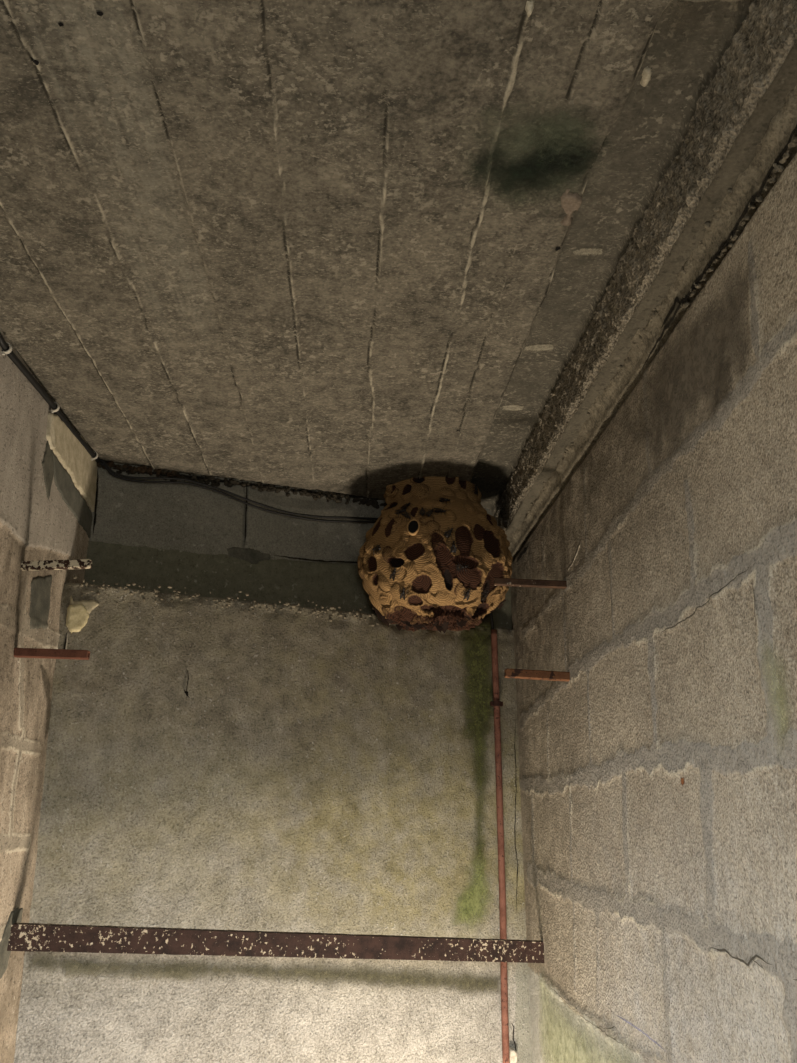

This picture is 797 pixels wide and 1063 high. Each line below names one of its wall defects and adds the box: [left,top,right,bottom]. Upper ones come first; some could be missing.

water stain [476,119,598,200]
water stain [654,284,746,448]
crack [660,564,758,634]
water stain [457,733,487,922]
crack [711,947,772,971]